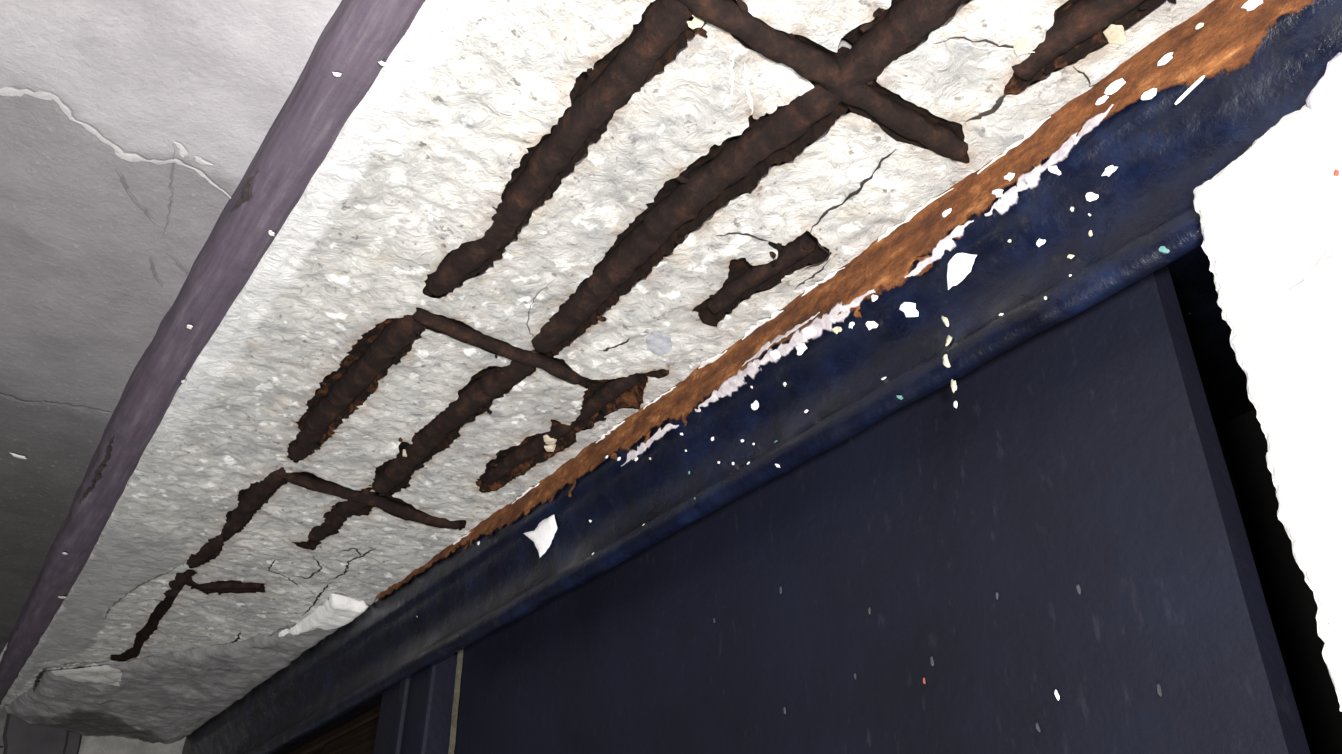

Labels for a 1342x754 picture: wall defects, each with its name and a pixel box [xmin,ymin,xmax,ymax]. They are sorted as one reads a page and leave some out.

spalling [492,0,656,218]
spalling [626,15,708,103]
spalling [783,0,900,58]
spalling [1004,0,1176,95]
peeling [1141,88,1157,100]
peeling [1241,0,1263,11]
crack [116,145,188,286]
peeling [877,78,1126,290]
corrosion [371,0,1314,606]
spalling [110,80,1051,661]
crack [105,564,181,619]
crack [231,548,376,643]